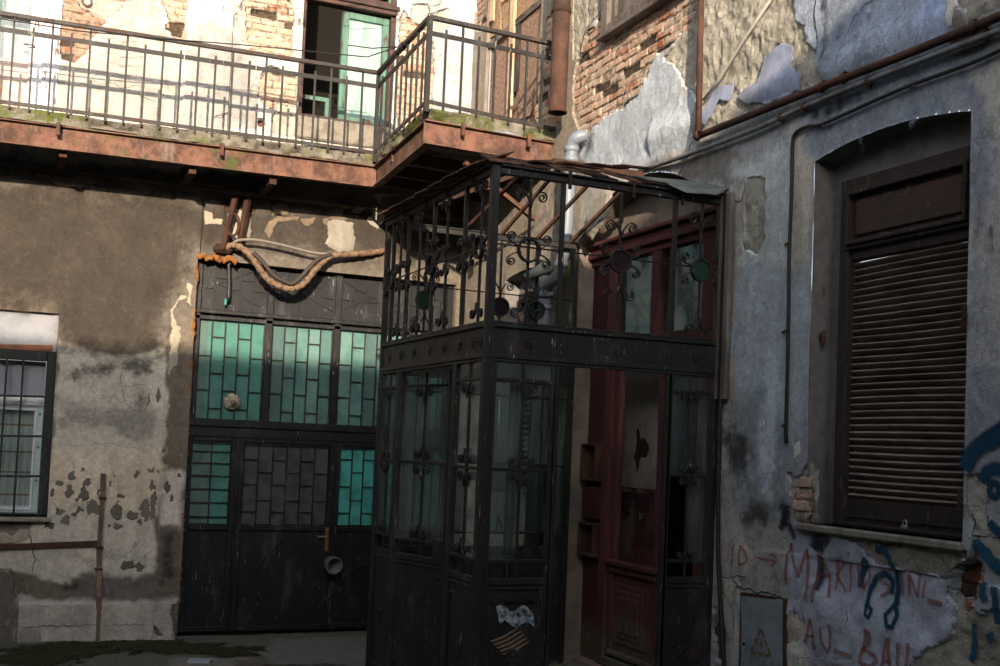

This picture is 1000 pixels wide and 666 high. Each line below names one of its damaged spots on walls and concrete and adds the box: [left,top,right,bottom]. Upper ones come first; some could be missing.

flaking render [60,0,128,62]
flaking render [162,0,188,40]
flaking render [234,0,298,137]
flaking render [573,0,821,134]
flaking render [743,177,766,254]
peeling [44,448,182,530]
flaking render [790,462,820,523]
rust [0,474,107,641]
crack [0,528,148,638]
peeling [120,557,145,572]
flaking render [842,475,1000,666]
flaking render [787,613,806,643]